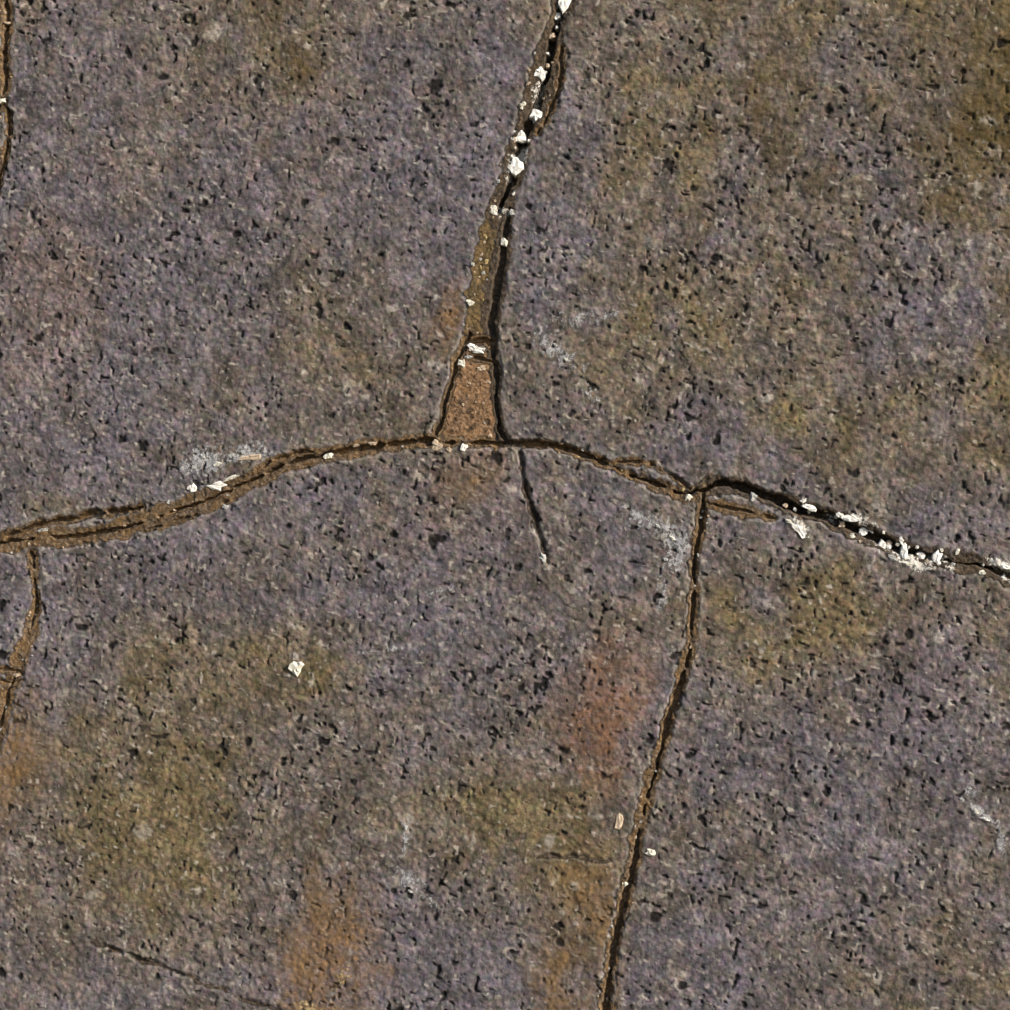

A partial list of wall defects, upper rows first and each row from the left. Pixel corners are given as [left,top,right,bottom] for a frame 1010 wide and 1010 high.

crack [0,0,577,756]
crack [90,940,280,1010]
crack [512,439,1010,1010]